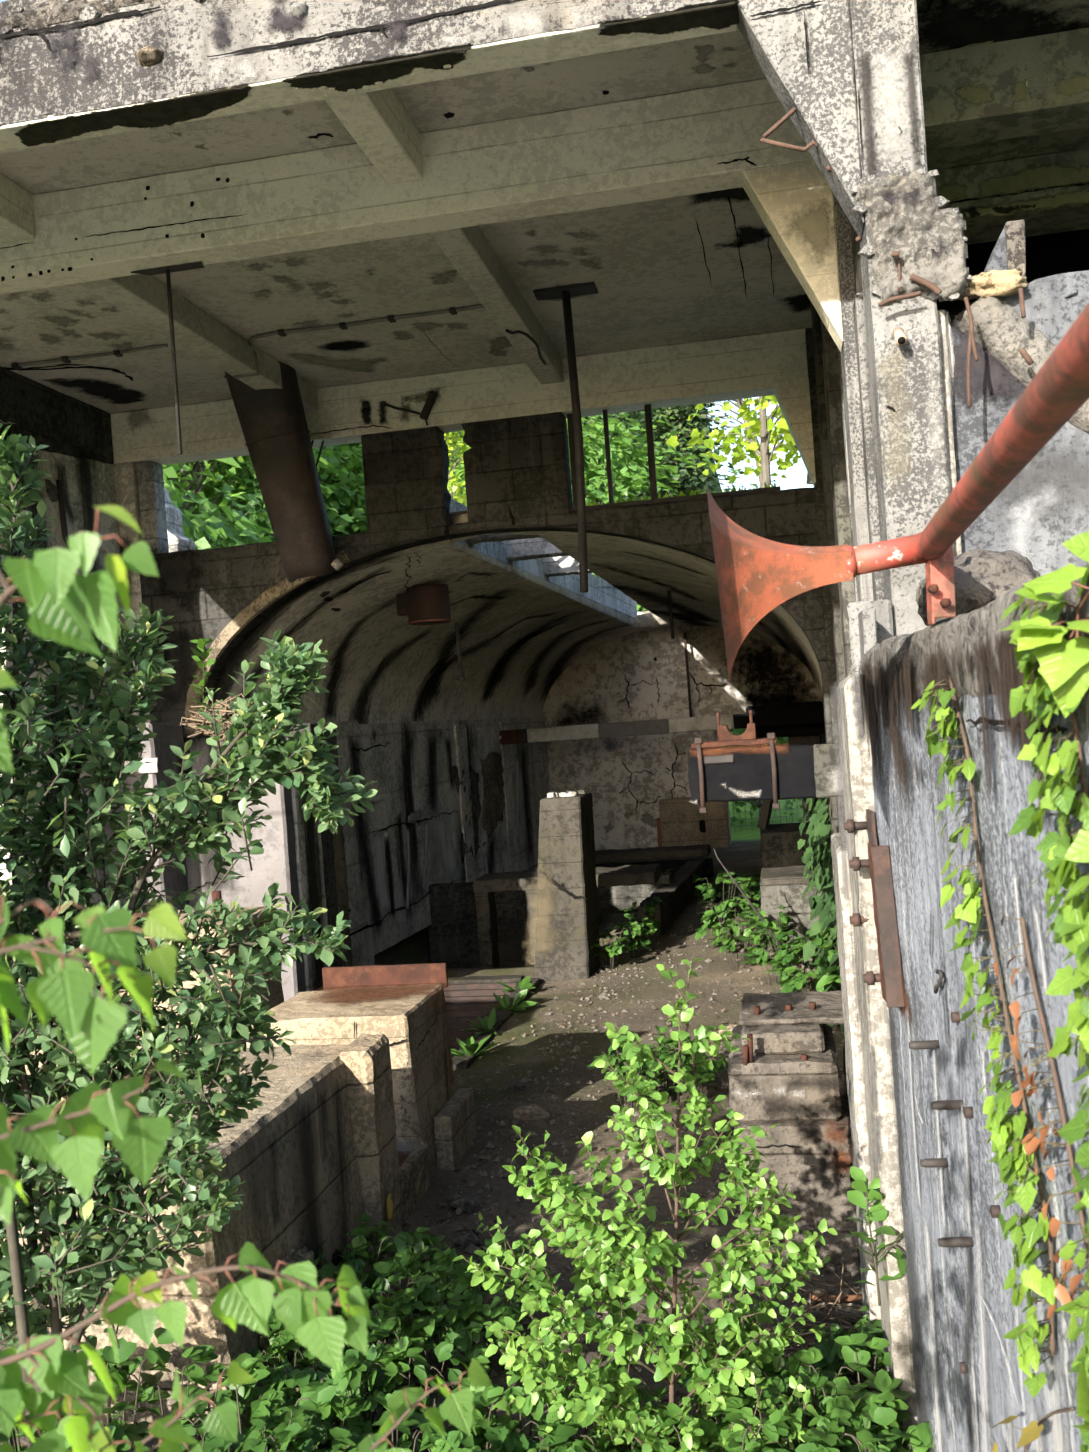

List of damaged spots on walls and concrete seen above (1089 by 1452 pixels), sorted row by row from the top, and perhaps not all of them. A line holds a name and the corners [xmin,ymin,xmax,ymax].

peeling [282,41,474,93]
peeling [0,84,252,147]
spalling [760,107,817,152]
spalling [847,168,1036,407]
leakage [966,635,1047,823]
leakage [834,646,948,899]
corrosion [901,978,910,1019]